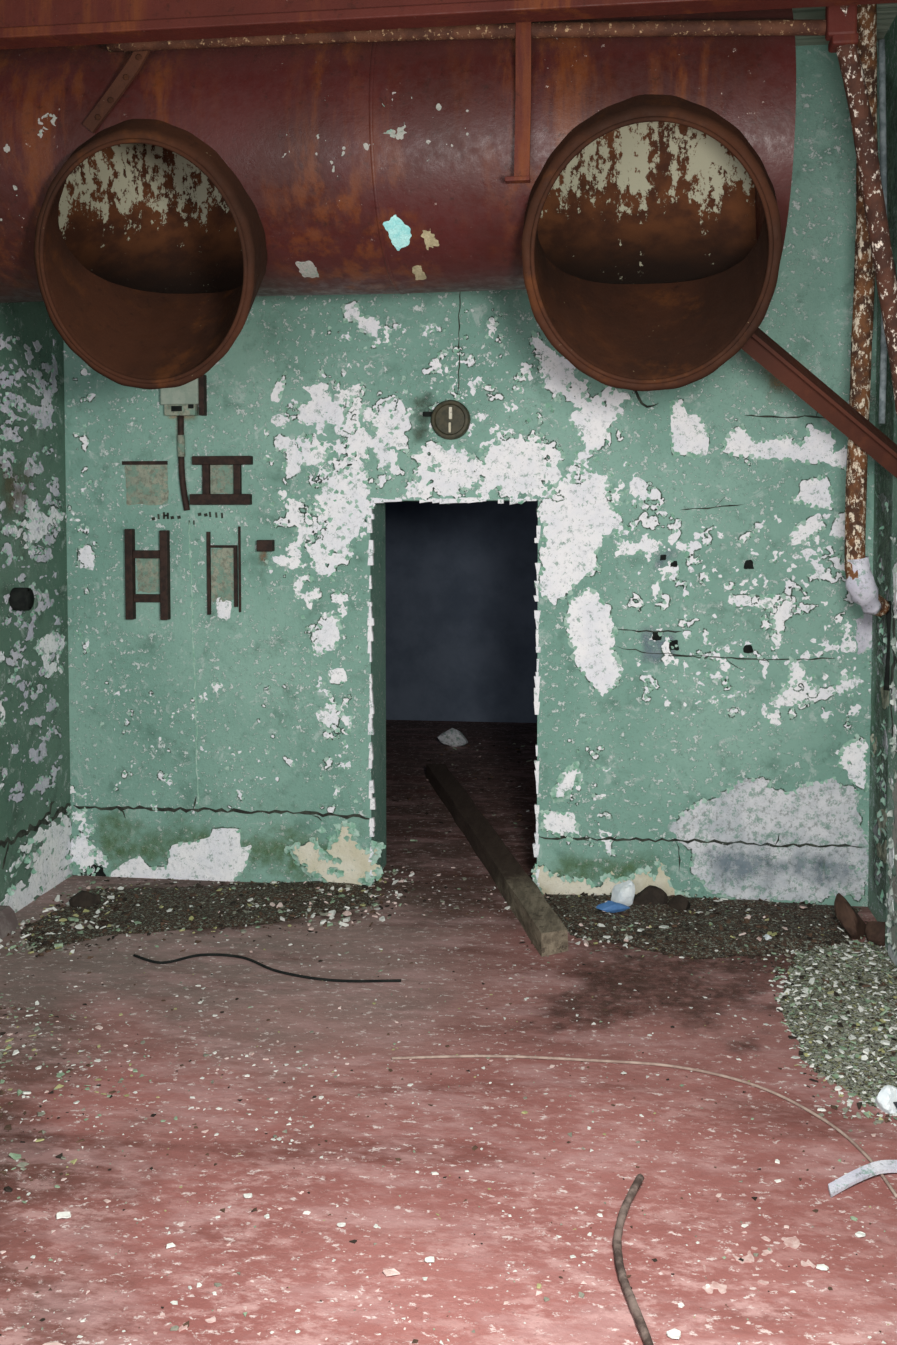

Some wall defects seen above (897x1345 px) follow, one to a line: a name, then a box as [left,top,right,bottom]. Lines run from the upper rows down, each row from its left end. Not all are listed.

peeling [384,123,407,140]
peeling [383,215,439,251]
peeling [295,261,319,278]
peeling [412,265,427,280]
peeling [327,300,446,349]
peeling [0,334,252,913]
peeling [221,732,298,809]